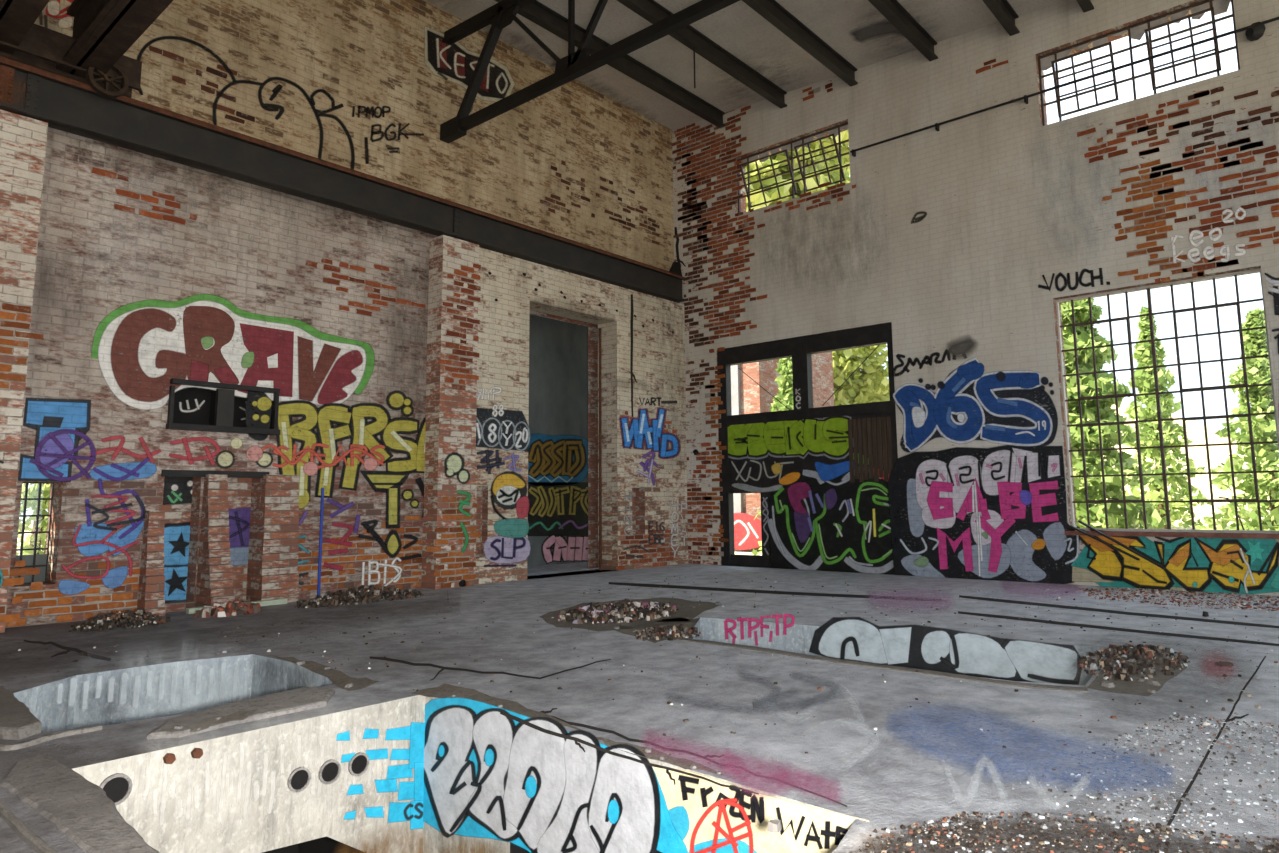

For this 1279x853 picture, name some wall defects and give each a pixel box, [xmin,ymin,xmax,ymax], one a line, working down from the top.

peeling [91,167,197,225]
peeling [1077,86,1279,283]
peeling [306,258,426,316]
peeling [438,263,498,390]
peeling [540,105,856,570]
crack [1165,656,1266,831]